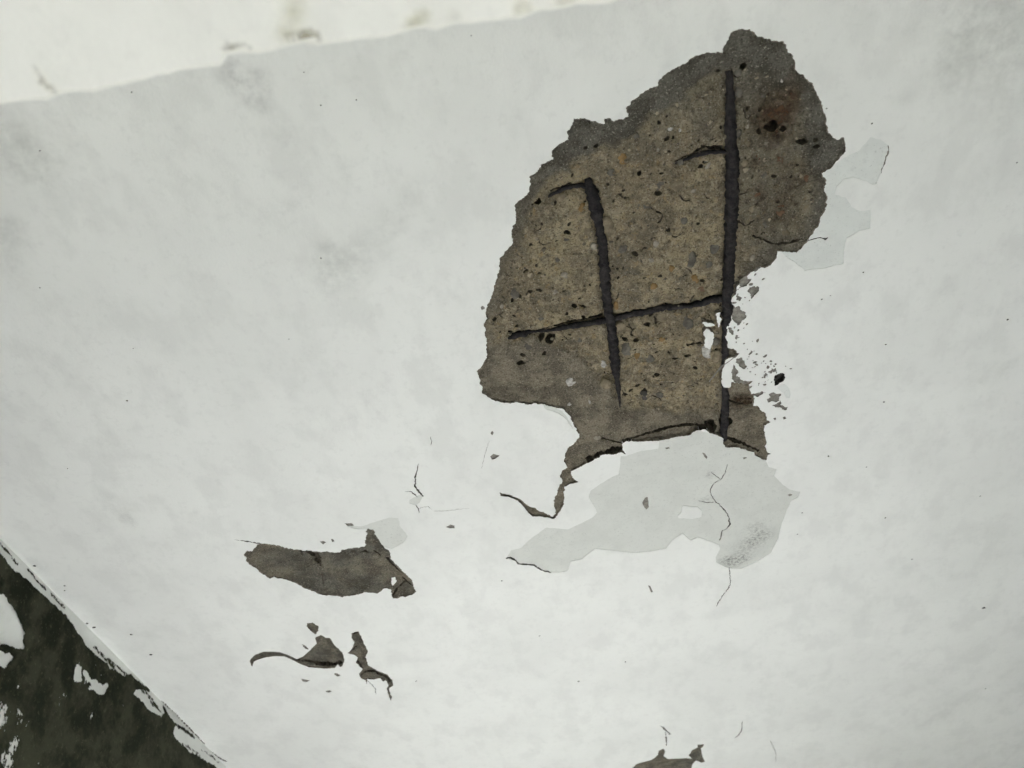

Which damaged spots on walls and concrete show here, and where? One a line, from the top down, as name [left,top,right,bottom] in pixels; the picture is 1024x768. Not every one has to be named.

spalling [477,29,888,573]
crack [407,464,467,511]
crack [702,464,731,540]
spalling [244,518,416,598]
spalling [250,622,393,700]
spalling [633,744,705,768]